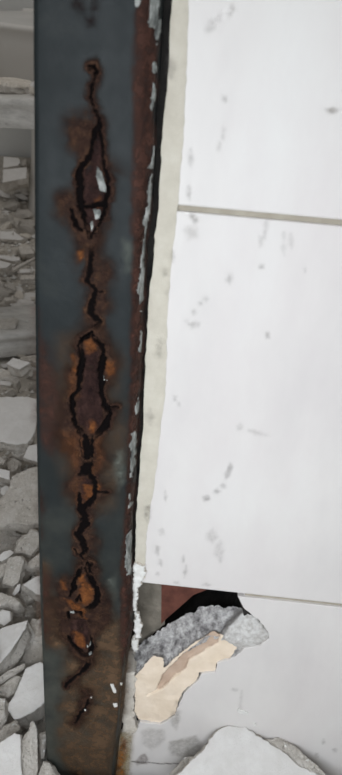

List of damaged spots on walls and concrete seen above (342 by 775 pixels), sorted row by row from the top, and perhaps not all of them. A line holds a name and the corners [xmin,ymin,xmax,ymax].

peeling [135,0,162,45]
crack [72,224,114,350]
peeling [136,146,155,312]
crack [58,431,113,575]
rust [36,0,157,775]
peeling [129,431,137,478]
crack [62,654,94,728]
spalling [124,529,269,722]